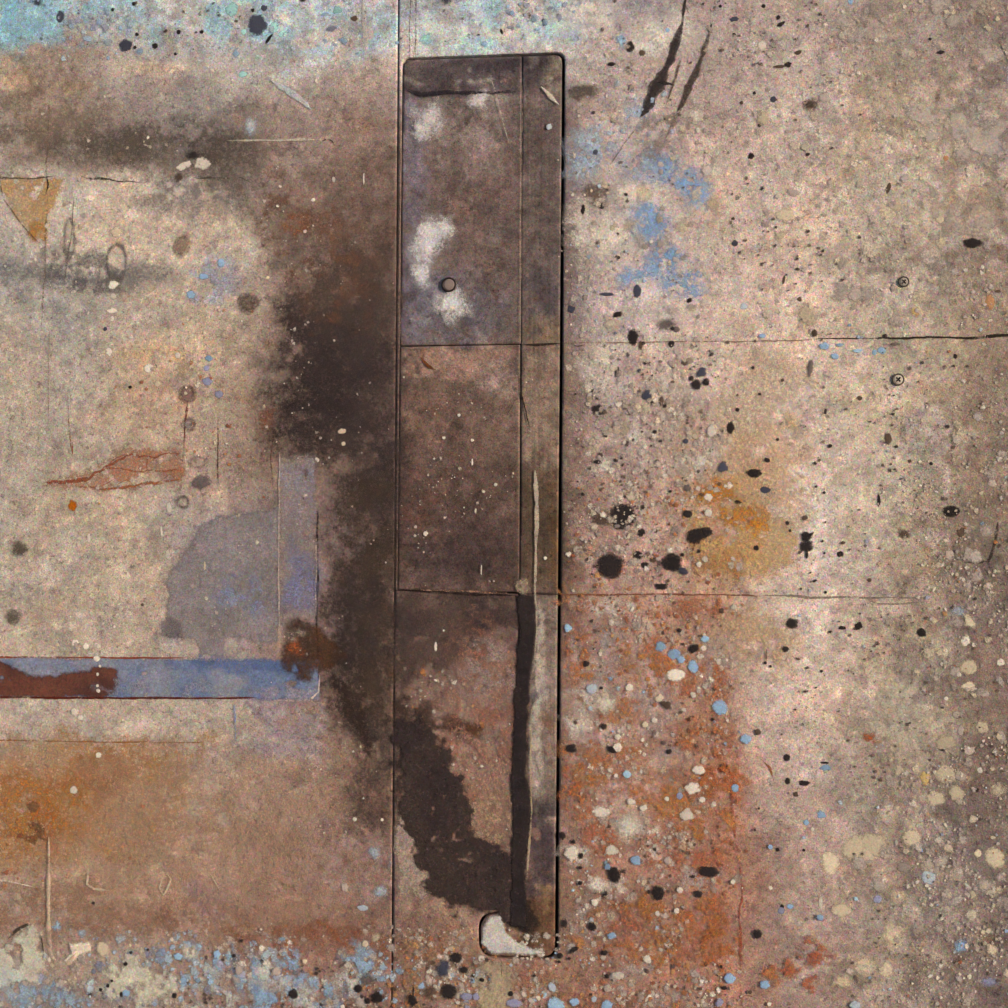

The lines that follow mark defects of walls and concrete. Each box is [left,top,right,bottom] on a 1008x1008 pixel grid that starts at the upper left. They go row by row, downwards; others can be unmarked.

water stain [238,295,259,312]
crack [525,334,1008,347]
crack [508,372,529,425]
rust [43,444,196,498]
water stain [255,246,409,833]
rust [516,350,831,1008]
rust [438,629,514,844]
rust [0,729,216,906]
water stain [510,900,541,934]
rust [387,933,510,1008]